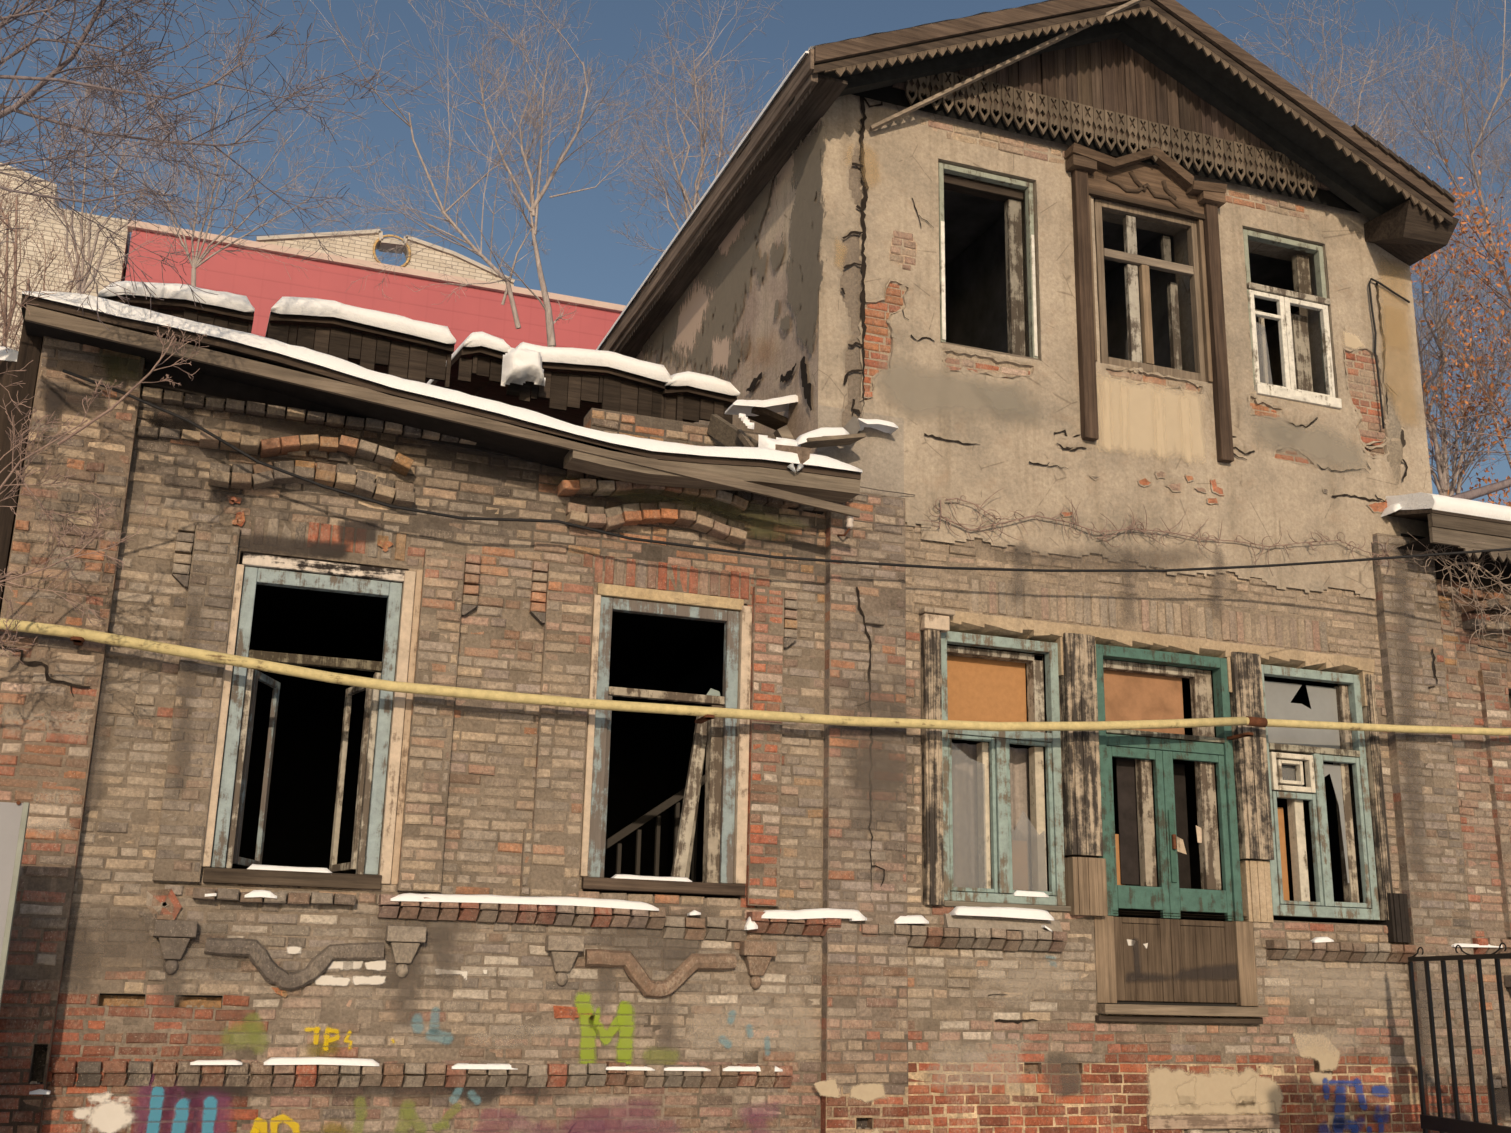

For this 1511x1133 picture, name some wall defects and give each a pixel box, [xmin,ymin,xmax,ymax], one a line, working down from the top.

peeling [637,121,917,433]
crack [746,356,812,411]
crack [851,97,883,418]
flaking render [1342,332,1408,513]
crack [856,587,885,905]
spalling [856,1118,872,1129]